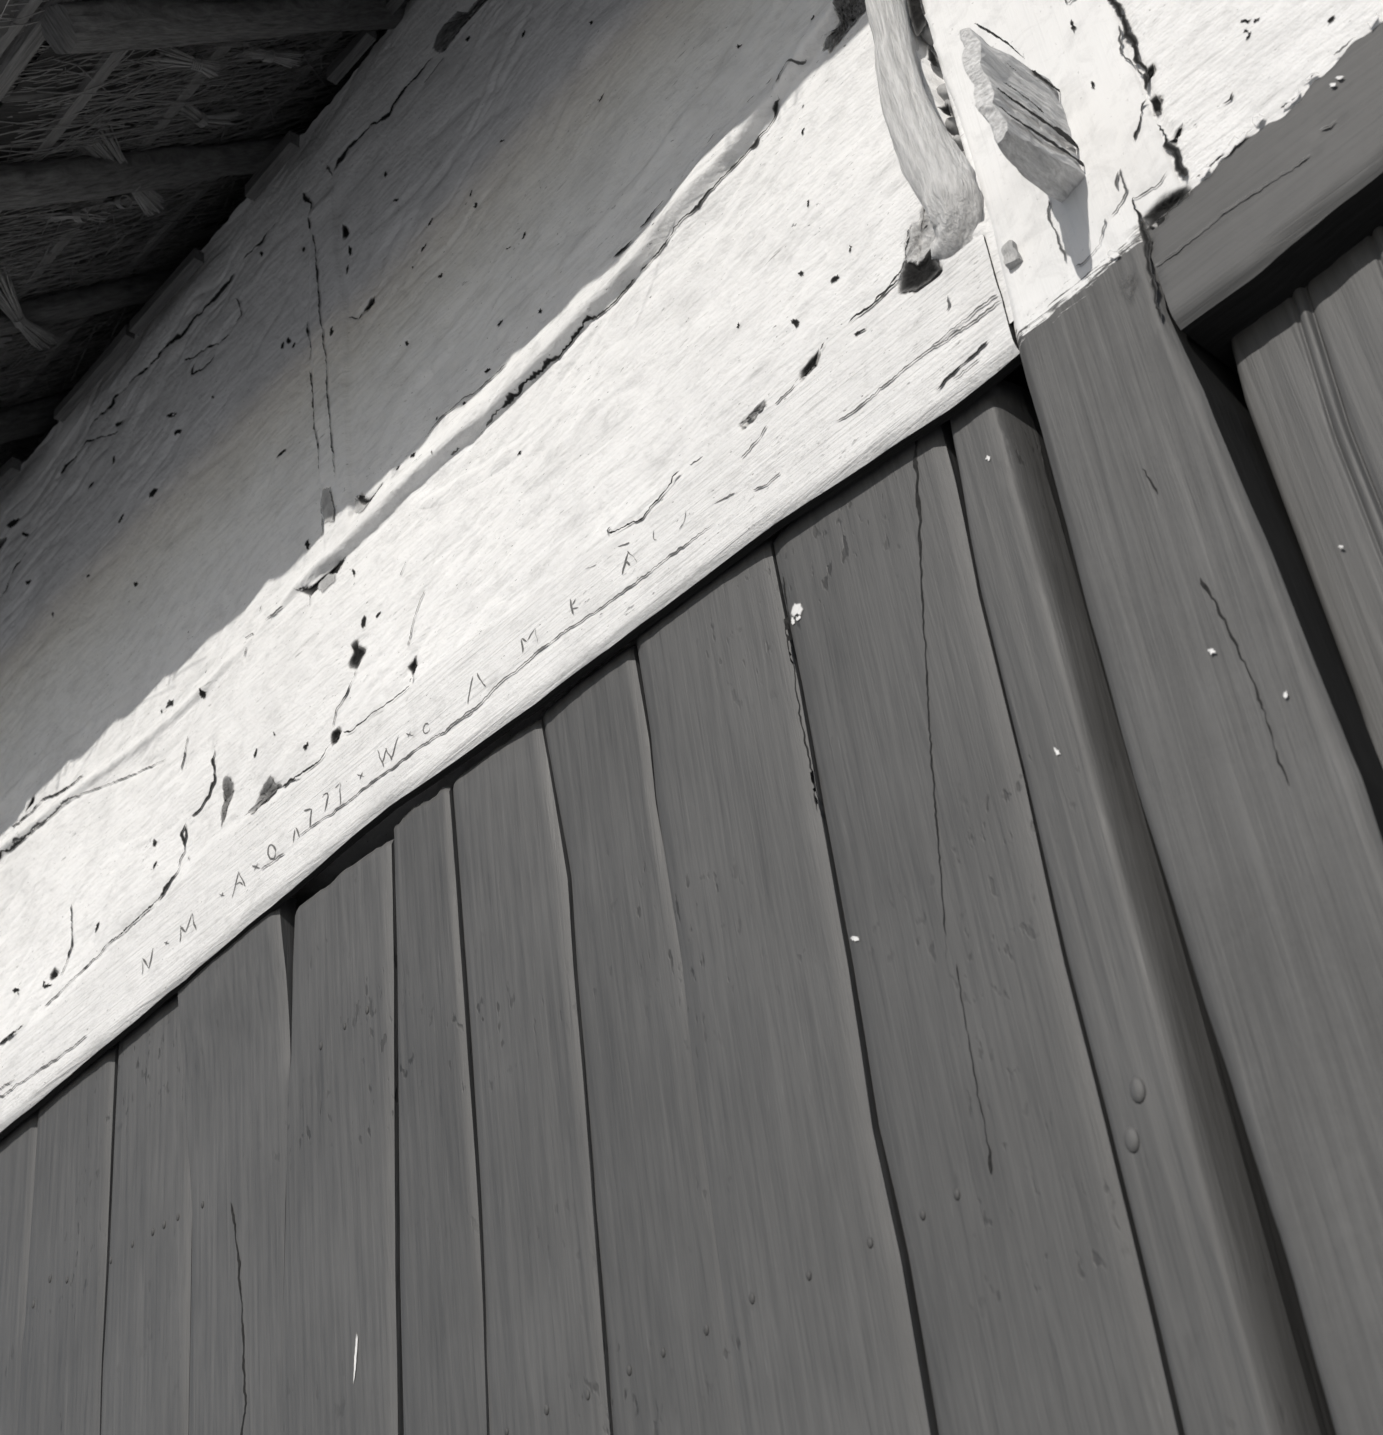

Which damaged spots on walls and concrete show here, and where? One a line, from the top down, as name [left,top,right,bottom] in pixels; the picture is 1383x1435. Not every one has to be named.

crack [59,57,444,533]
crack [429,59,807,455]
flaking render [822,0,866,51]
crack [975,0,1334,321]
crack [0,737,216,1044]
flaking render [221,776,233,826]
flaking render [246,776,282,815]
crack [0,1035,86,1097]